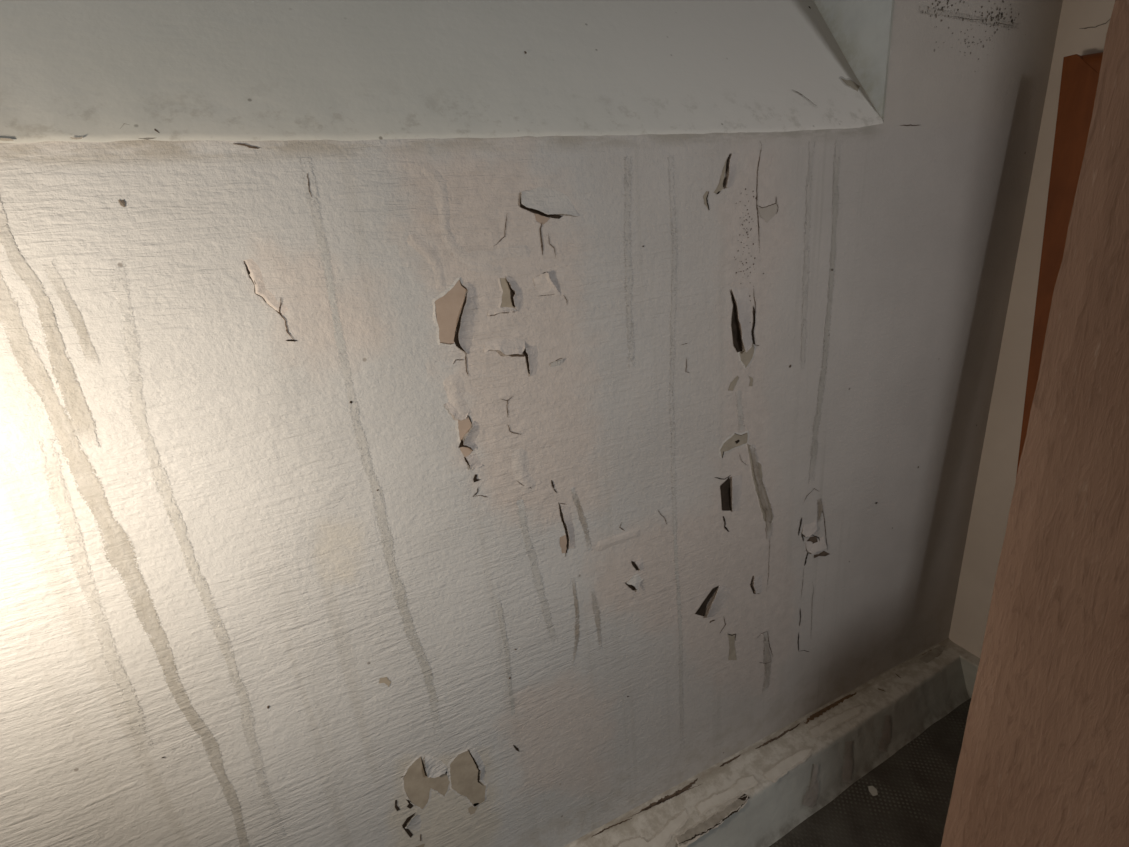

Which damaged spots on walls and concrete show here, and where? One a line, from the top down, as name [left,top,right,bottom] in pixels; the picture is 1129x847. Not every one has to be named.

peeling [520,187,578,256]
peeling [703,153,740,209]
crack [244,259,297,342]
peeling [432,272,567,376]
peeling [728,288,759,391]
leakage [0,196,250,847]
leakage [108,259,287,840]
peeling [444,402,486,497]
leakage [207,134,841,847]
peeling [715,431,774,553]
peeling [695,586,737,660]
peeling [395,748,488,847]